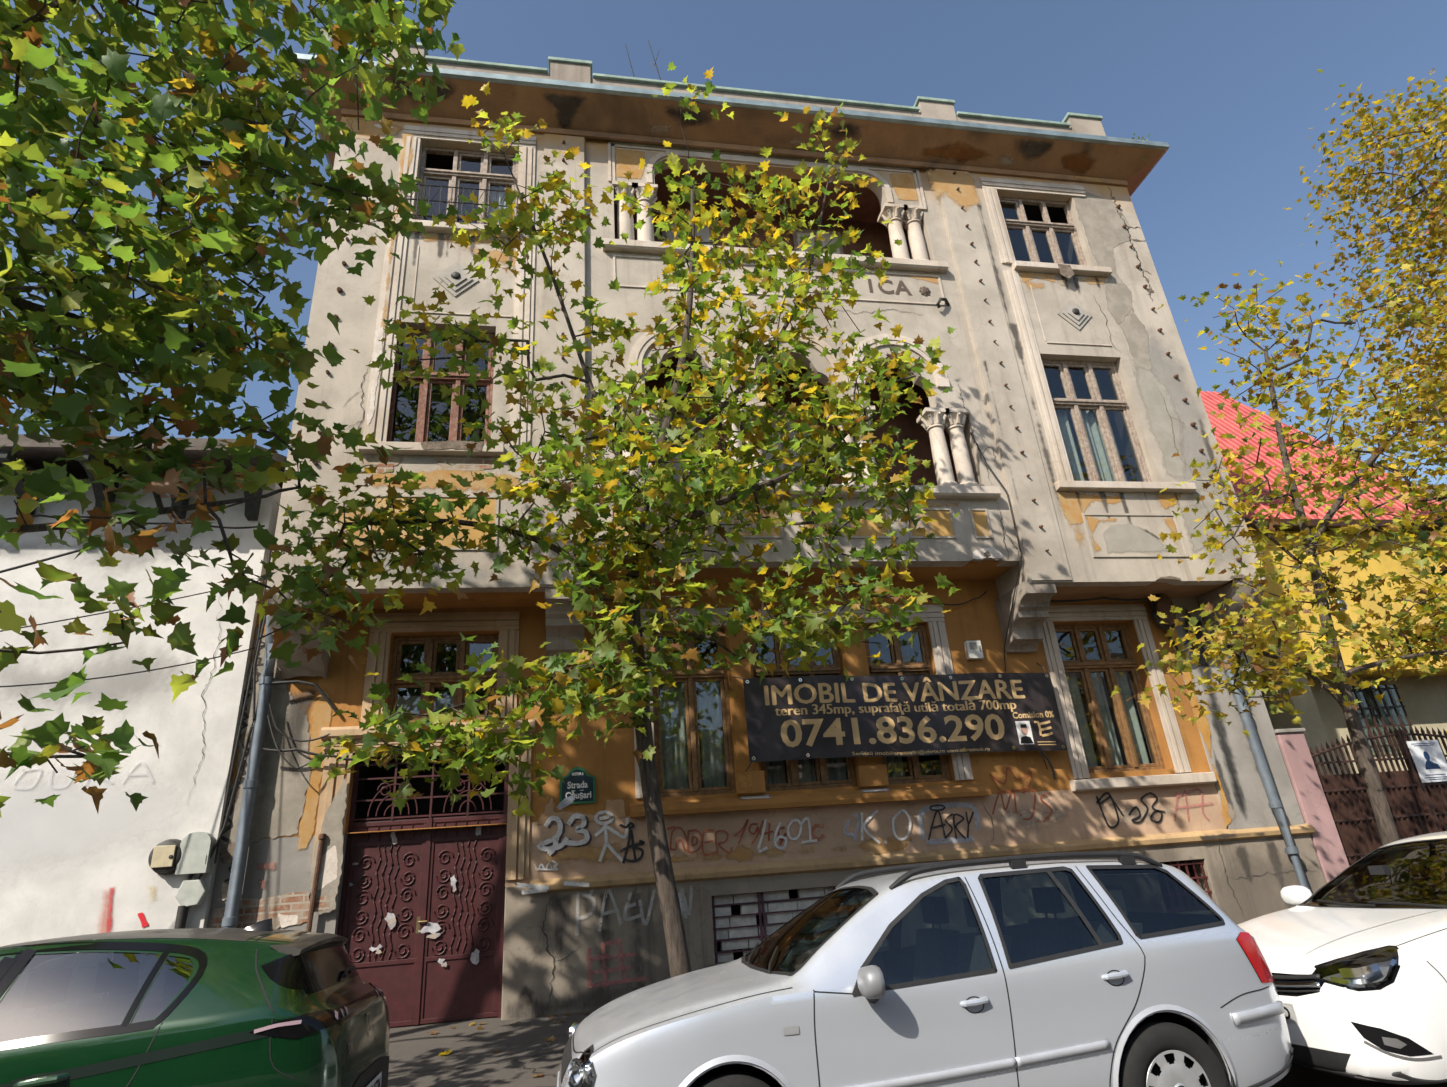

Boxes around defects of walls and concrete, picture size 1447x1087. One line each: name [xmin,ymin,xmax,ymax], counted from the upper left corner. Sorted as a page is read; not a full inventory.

leakage [546,95,581,129]
leakage [1001,141,1052,164]
peeling [890,170,979,208]
crack [1108,186,1154,300]
peeling [1058,491,1121,551]
peeling [1157,494,1180,533]
crack [187,596,265,882]
flaking render [211,689,347,929]